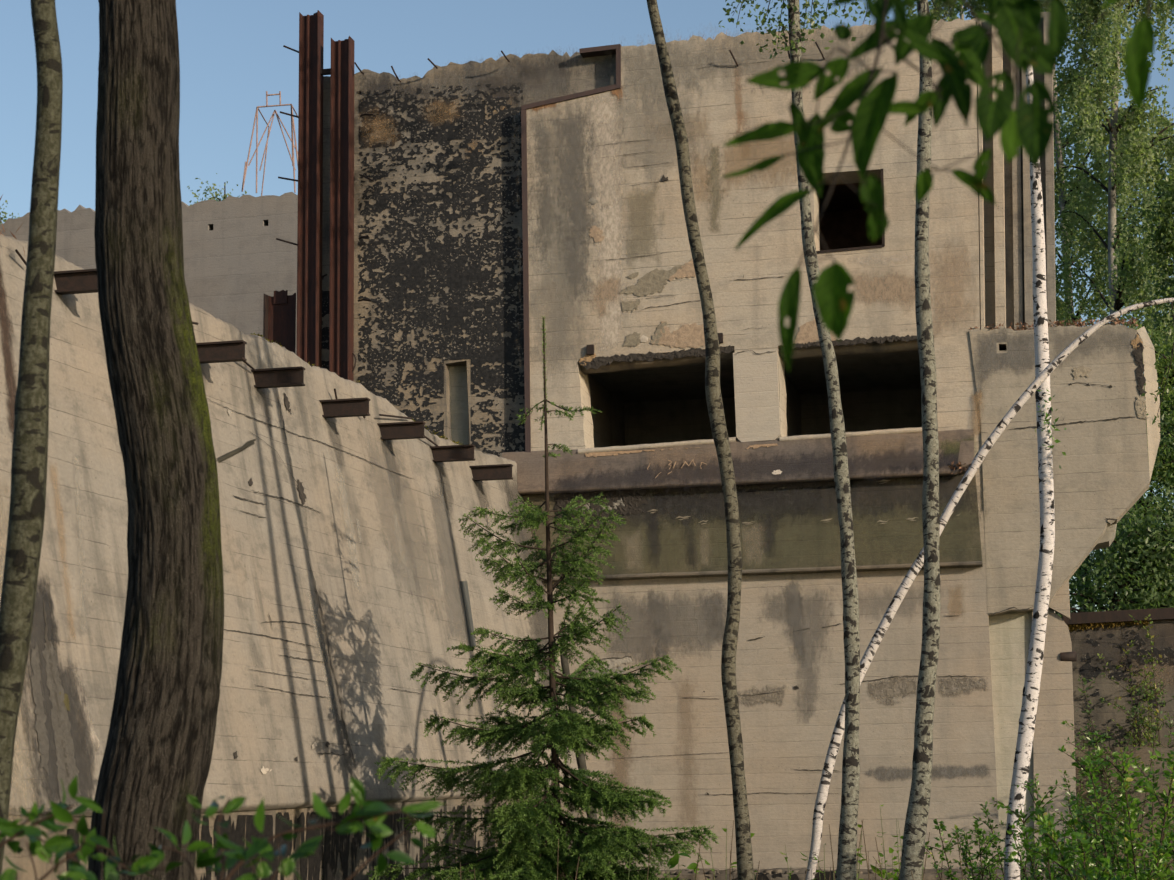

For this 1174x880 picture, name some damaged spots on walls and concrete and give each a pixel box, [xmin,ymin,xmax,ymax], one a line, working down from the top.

peeling [358,66,525,457]
leakage [561,97,624,351]
peeling [596,259,696,315]
spalling [1131,334,1148,419]
leakage [786,583,804,657]
leakage [24,581,99,815]
peeling [1080,633,1174,697]